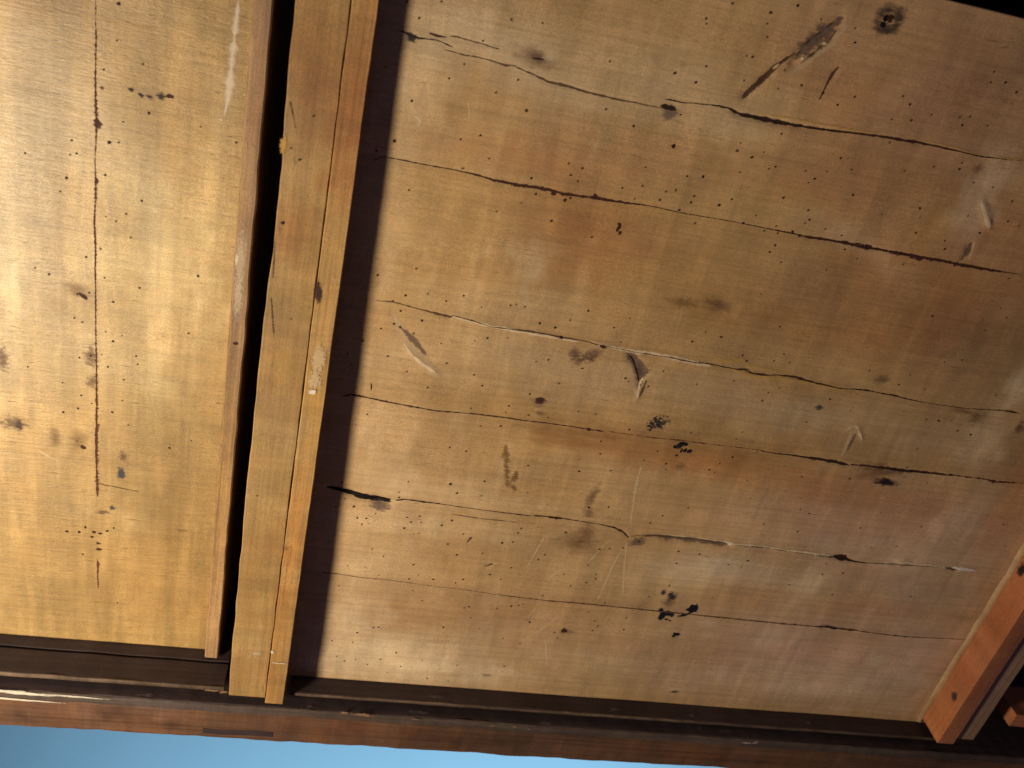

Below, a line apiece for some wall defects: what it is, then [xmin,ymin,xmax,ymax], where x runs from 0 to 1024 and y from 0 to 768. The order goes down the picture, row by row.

crack [396,30,1022,161]
crack [93,0,139,497]
crack [371,157,1016,274]
crack [382,301,1020,414]
crack [344,394,1022,484]
crack [95,542,103,587]
crack [321,572,962,640]
crack [327,486,977,571]